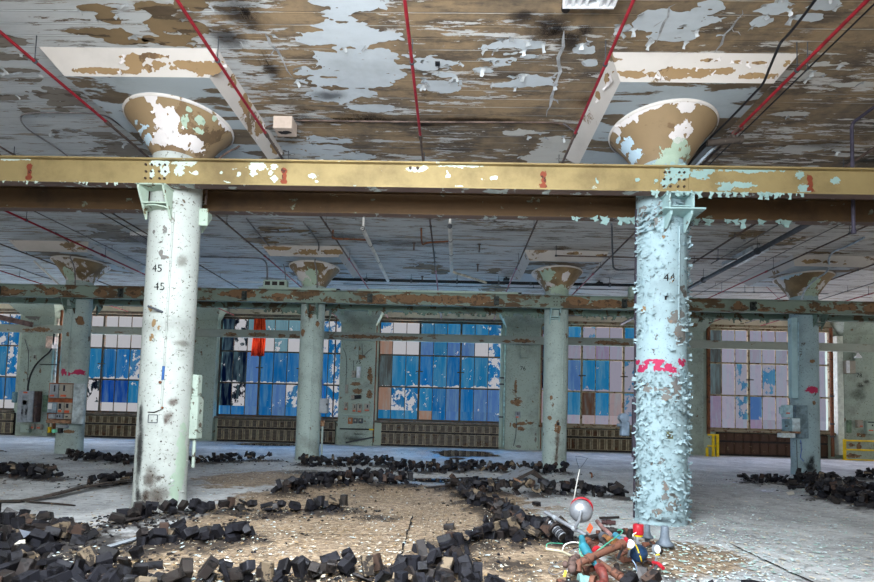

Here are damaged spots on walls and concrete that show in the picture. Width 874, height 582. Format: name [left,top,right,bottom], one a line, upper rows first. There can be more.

peeling [0,35,94,115]
peeling [60,0,237,89]
peeling [291,0,559,113]
peeling [572,38,598,67]
peeling [613,0,727,51]
peeling [595,56,873,103]
peeling [749,0,842,29]
peeling [49,96,230,178]
peeling [220,135,377,183]
peeling [503,128,574,164]
peeling [538,102,811,523]
damp [136,406,162,508]